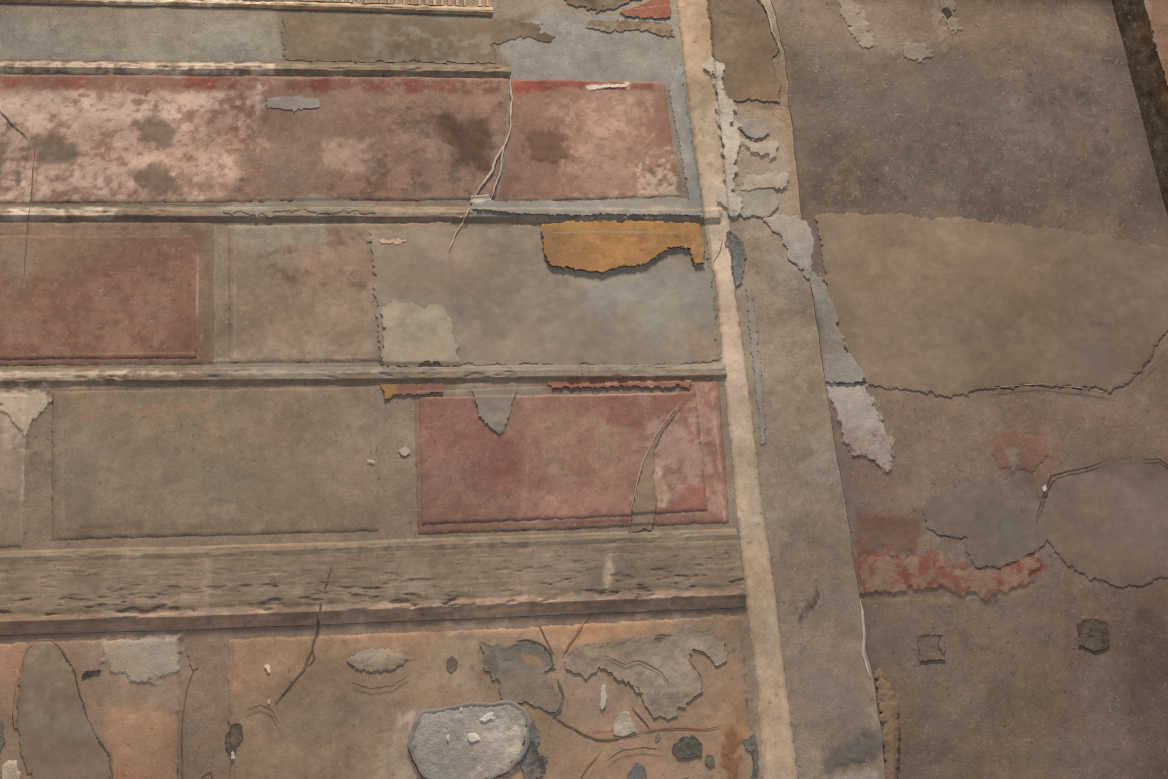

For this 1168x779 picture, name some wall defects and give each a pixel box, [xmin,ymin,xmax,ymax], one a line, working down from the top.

flaking render [567,0,675,37]
flaking render [706,0,782,104]
flaking render [724,230,747,286]
crack [1036,460,1107,518]
crack [275,566,332,704]
flaking render [408,621,728,779]
flaking render [0,722,21,779]